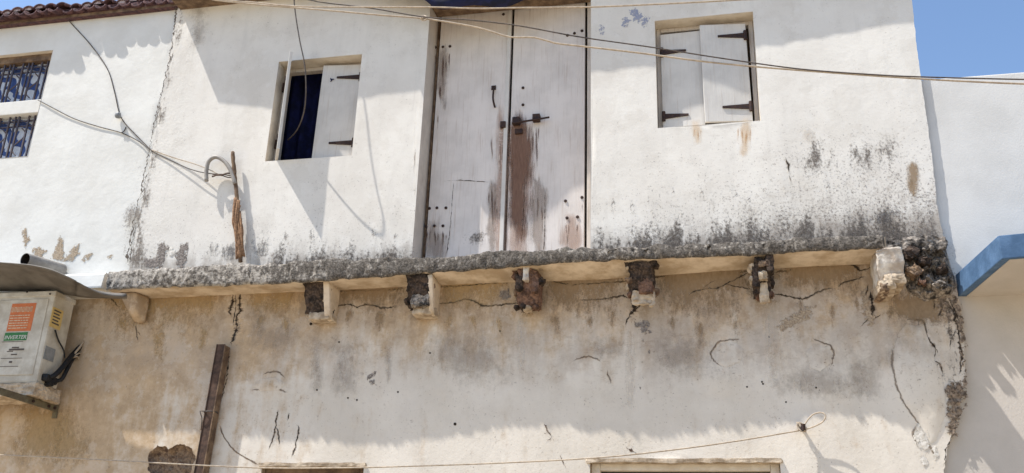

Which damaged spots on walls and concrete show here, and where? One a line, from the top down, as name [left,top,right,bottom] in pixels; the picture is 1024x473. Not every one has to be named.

crack [124,8,181,268]
peeling [21,228,92,263]
water stain [593,207,937,249]
crack [339,289,394,309]
crack [439,282,518,307]
crack [689,271,750,295]
crack [774,265,880,324]
crack [222,294,242,396]
spalling [903,237,968,442]
crack [917,299,963,373]
spalling [147,444,196,473]
crack [219,412,299,464]